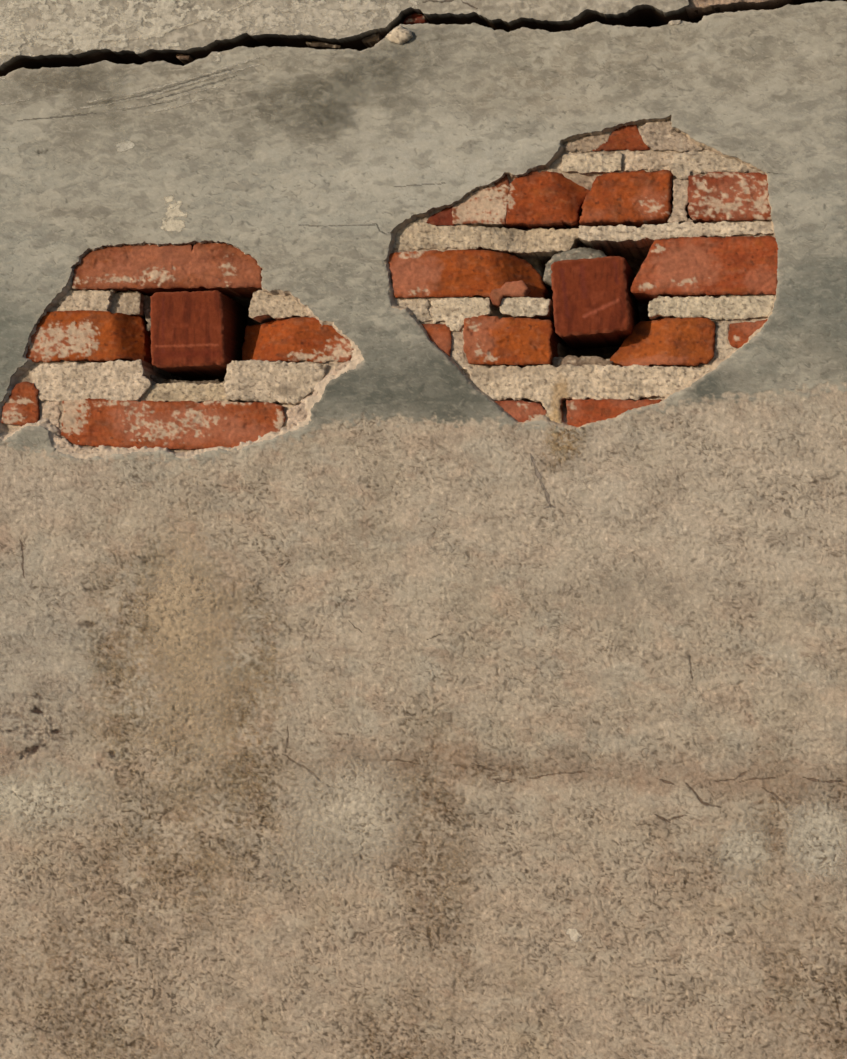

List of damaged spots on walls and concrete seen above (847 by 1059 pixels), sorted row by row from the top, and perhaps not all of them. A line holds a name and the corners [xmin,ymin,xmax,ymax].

crack [0,7,720,77]
spalling [685,0,818,20]
spalling [0,196,364,460]
spalling [385,116,778,431]